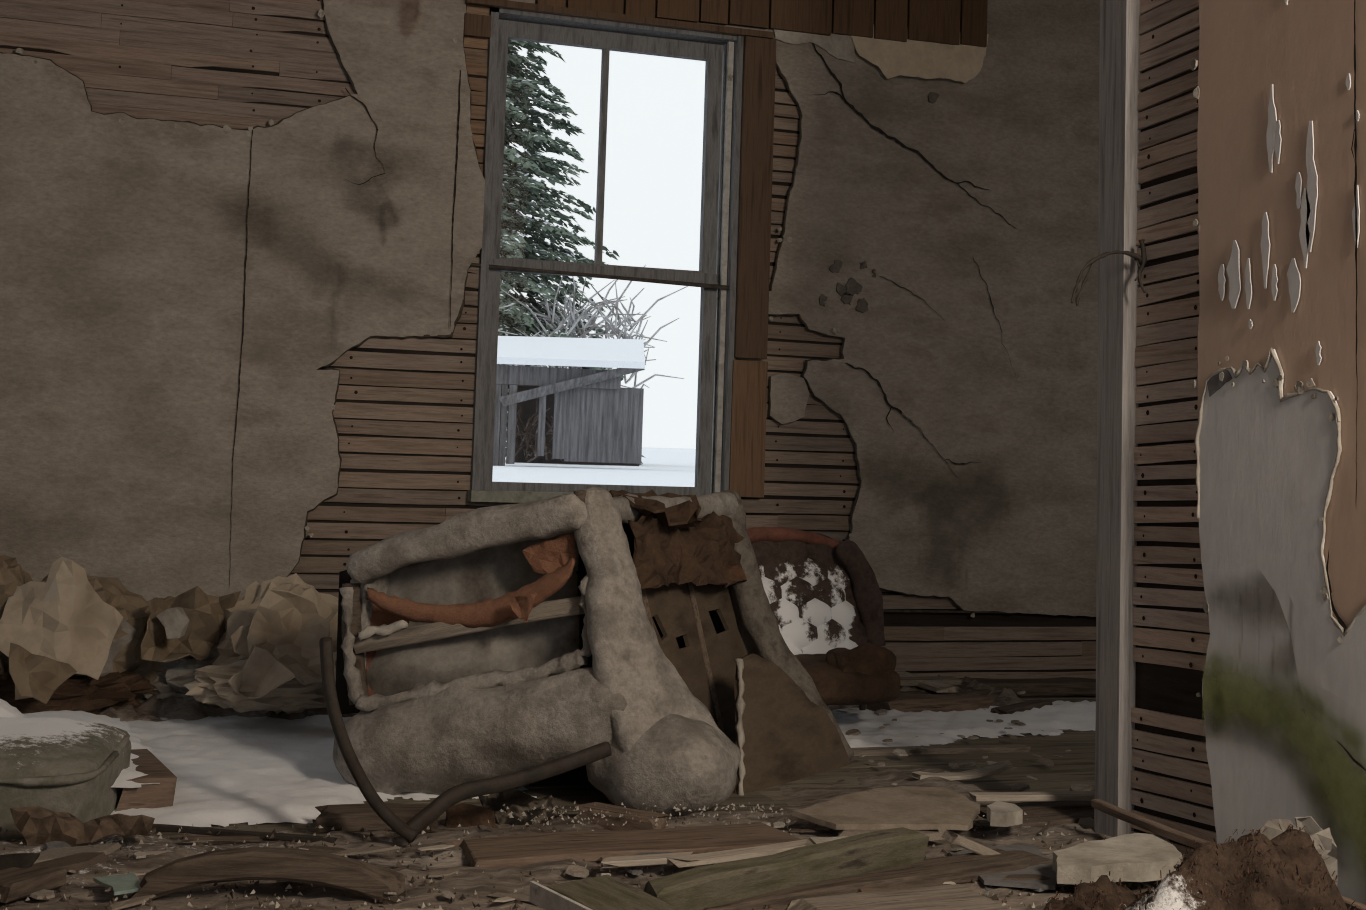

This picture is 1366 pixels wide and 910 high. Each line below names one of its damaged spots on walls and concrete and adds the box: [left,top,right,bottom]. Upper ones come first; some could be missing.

spalling [0,0,357,138]
spalling [769,64,802,291]
crack [812,43,1015,228]
spalling [287,251,730,598]
spalling [735,314,861,542]
spalling [819,260,876,313]
crack [880,276,945,321]
crack [846,363,980,478]
crack [973,258,1016,376]
peeling [1133,0,1366,766]
spalling [879,587,1096,679]
peeling [1131,708,1366,905]